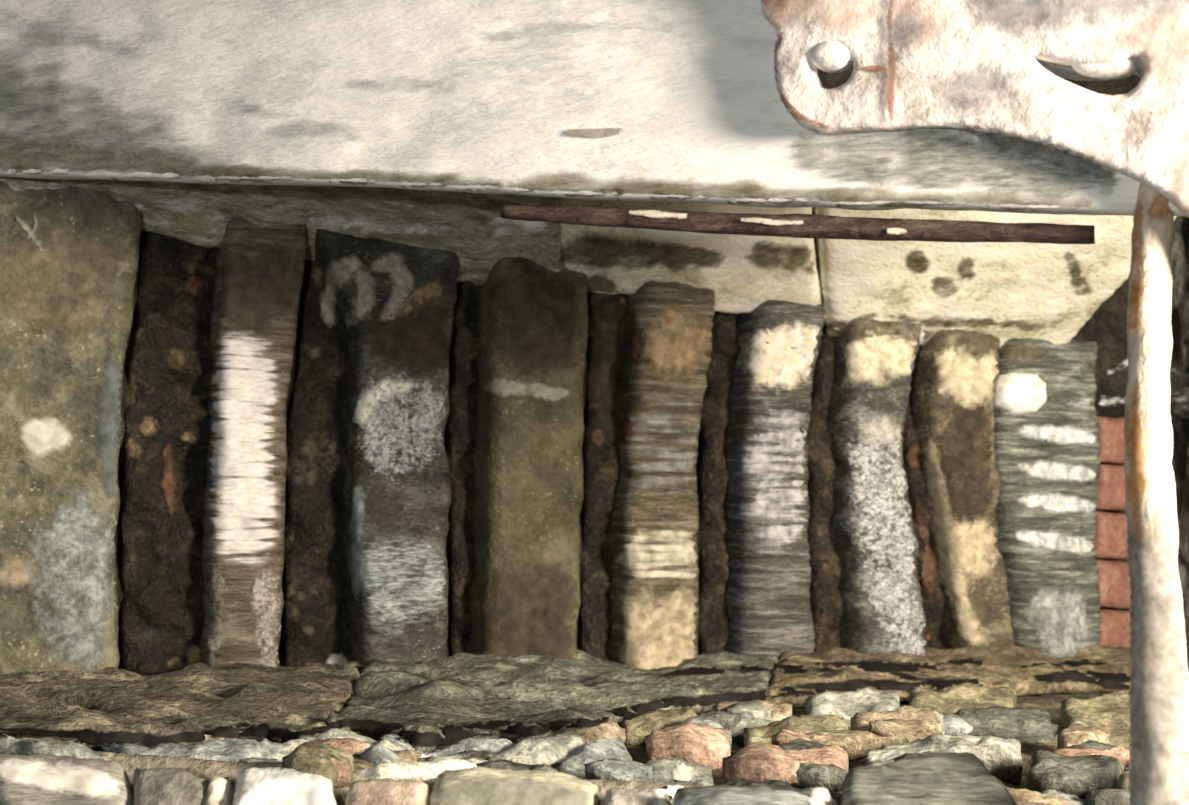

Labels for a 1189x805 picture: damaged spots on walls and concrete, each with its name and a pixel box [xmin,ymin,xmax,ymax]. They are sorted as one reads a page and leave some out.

rust [1127,195,1171,329]
rust [1126,381,1147,544]